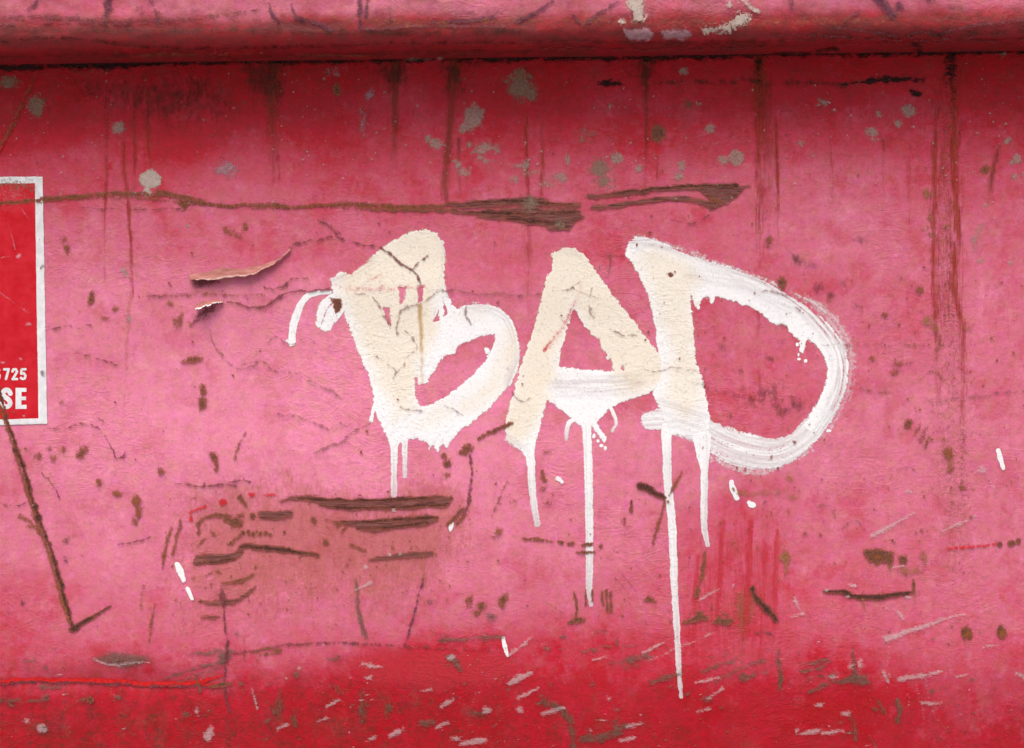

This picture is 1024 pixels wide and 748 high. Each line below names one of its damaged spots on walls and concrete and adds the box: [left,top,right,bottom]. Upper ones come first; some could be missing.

peeling [618,0,760,41]
peeling [504,68,538,103]
peeling [459,104,500,162]
peeling [590,153,623,190]
peeling [189,249,291,288]
corrosion [868,53,1002,504]
peeling [193,300,224,323]